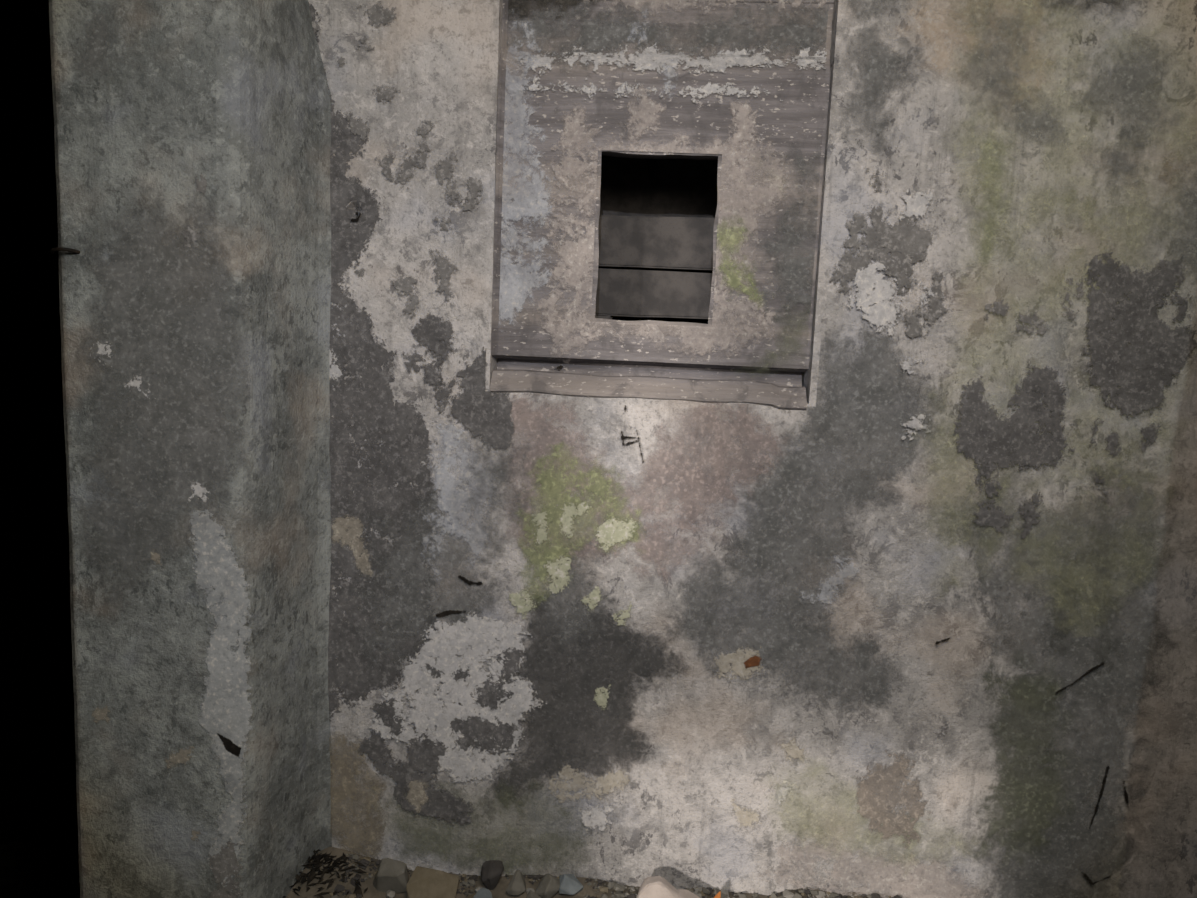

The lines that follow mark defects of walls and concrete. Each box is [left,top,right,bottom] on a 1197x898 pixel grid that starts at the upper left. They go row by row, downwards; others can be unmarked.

water stain [360,332,940,806]